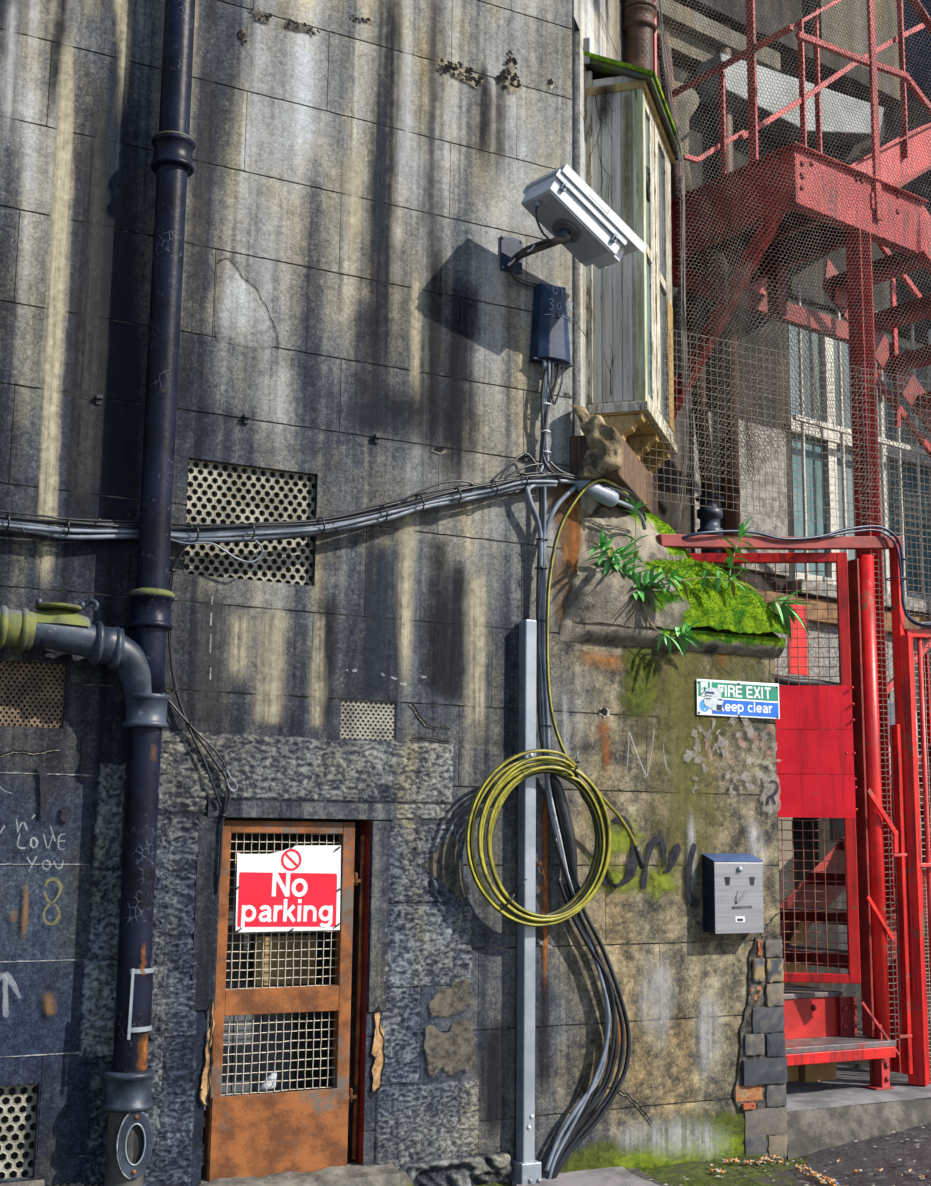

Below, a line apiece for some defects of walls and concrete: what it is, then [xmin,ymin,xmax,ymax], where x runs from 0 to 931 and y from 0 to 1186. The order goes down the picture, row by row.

spalling [438,50,523,93]
water stain [479,70,506,157]
water stain [40,0,130,525]
crack [217,258,279,349]
water stain [411,1,477,472]
rust [563,491,581,569]
water stain [425,543,485,719]
water stain [621,648,723,866]
peeling [684,717,781,814]
rust [139,1037,148,1069]
spalling [199,998,214,1106]
spalling [372,1006,385,1096]